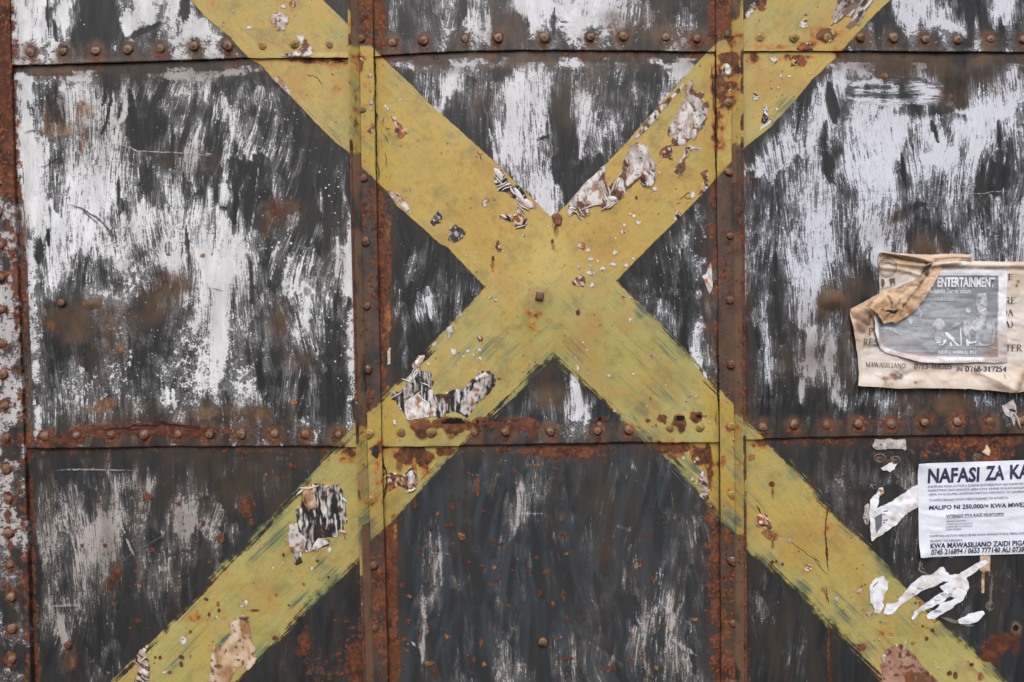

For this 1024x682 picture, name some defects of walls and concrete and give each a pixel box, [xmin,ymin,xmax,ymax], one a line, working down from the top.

peeling [270,0,313,59]
peeling [493,167,536,237]
peeling [547,80,710,287]
corrosion [381,218,393,354]
peeling [390,313,501,426]
corrosion [46,422,231,444]
corrosion [396,416,545,475]
corrosion [645,411,712,481]
corrosion [4,509,13,552]
peeling [272,483,349,570]
peeling [180,600,257,682]
corrosion [969,633,1018,680]